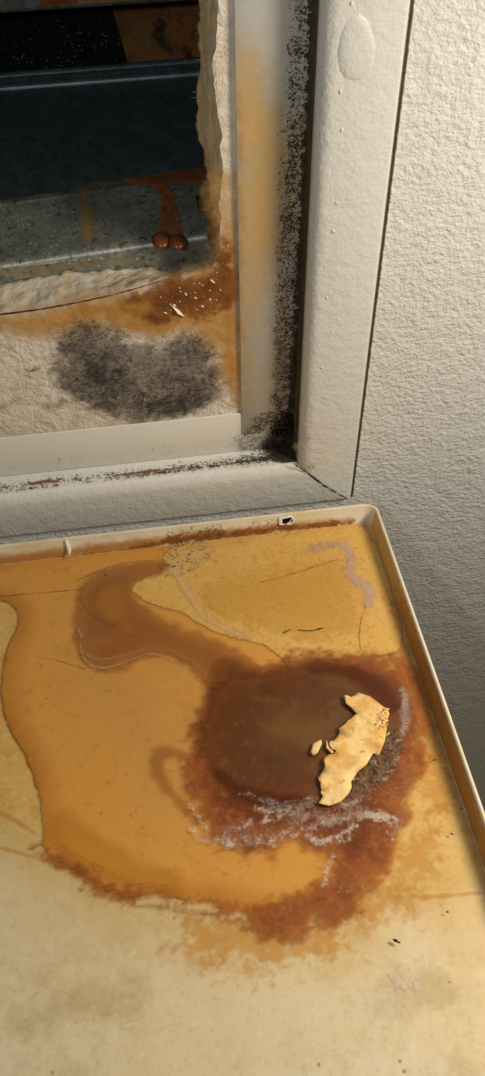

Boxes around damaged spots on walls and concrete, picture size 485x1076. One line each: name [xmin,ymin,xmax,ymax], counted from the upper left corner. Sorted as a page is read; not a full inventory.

corrosion [0,0,140,9]
corrosion [121,14,200,62]
damp [0,0,318,481]
corrosion [123,167,208,250]
damp [0,544,480,940]
peeling [311,693,390,806]